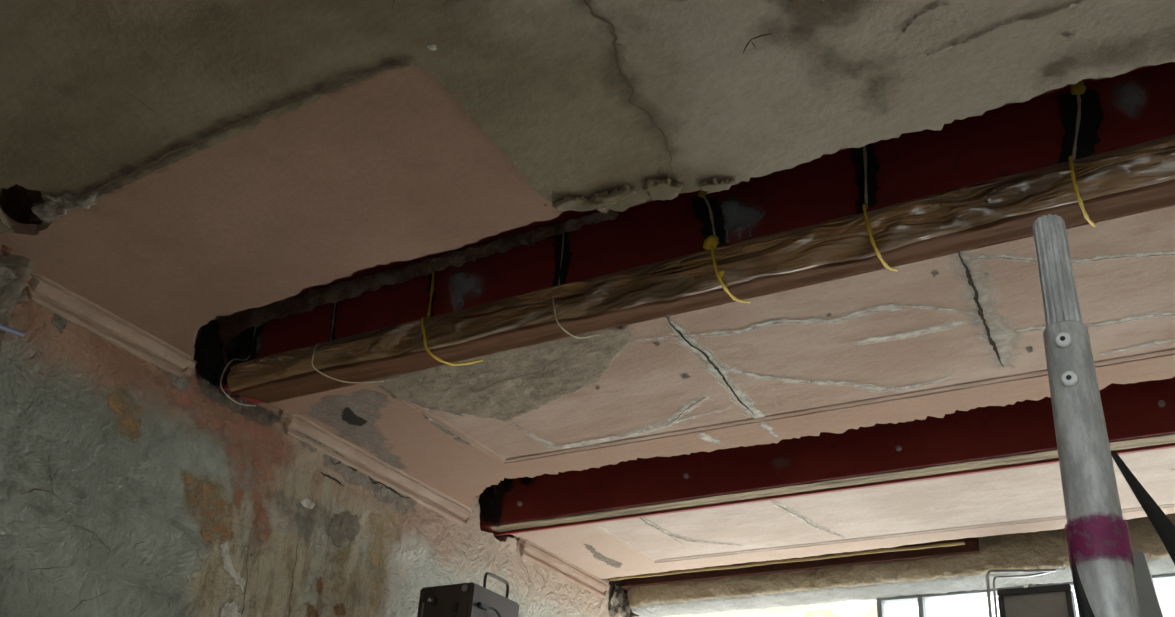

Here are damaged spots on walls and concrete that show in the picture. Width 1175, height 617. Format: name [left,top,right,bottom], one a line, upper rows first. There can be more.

crack [578,0,678,174]
flaking render [31,191,98,224]
crack [1071,251,1175,263]
crack [509,251,1046,449]
crack [1087,313,1175,357]
flaking render [157,367,281,426]
flaking render [309,391,406,468]
flaking render [296,430,415,513]
flaking render [282,498,360,546]
peeling [220,541,246,617]